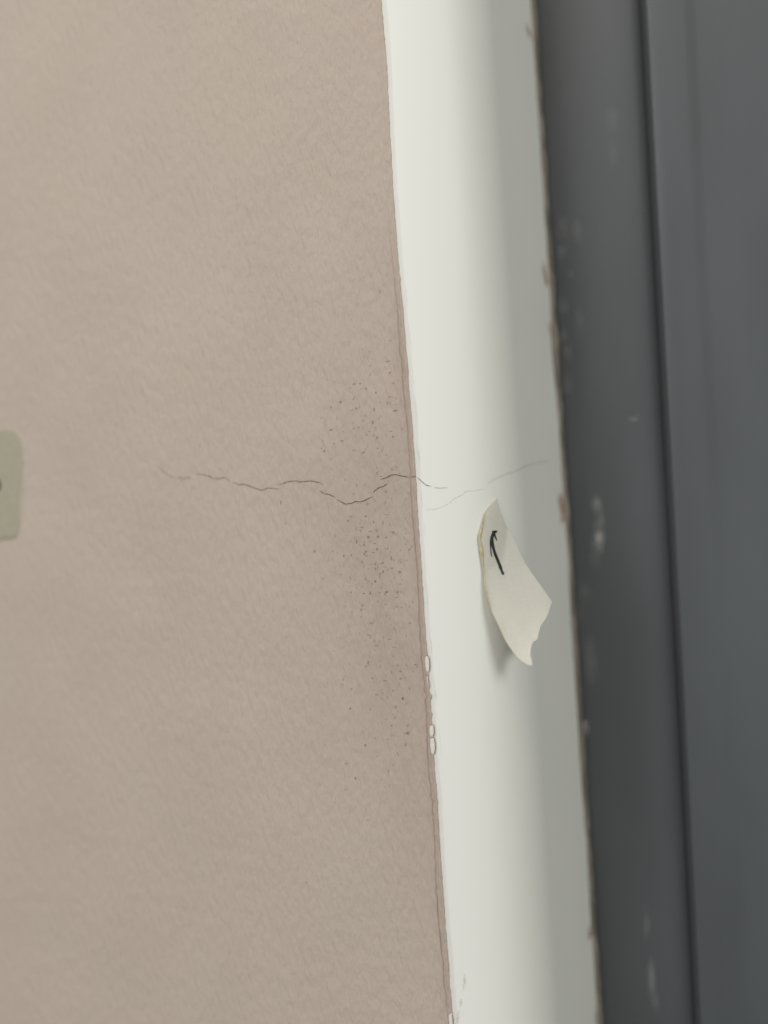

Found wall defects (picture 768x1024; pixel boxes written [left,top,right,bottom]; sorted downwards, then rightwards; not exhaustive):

crack [201,474,441,504]